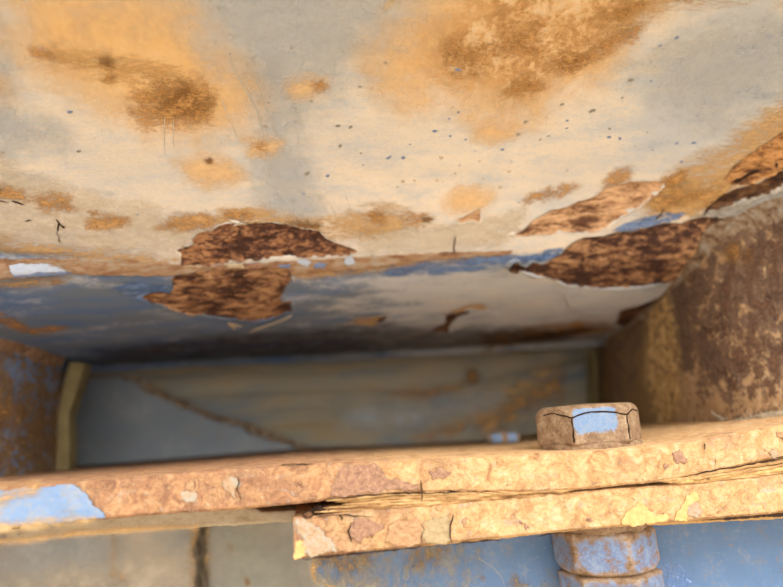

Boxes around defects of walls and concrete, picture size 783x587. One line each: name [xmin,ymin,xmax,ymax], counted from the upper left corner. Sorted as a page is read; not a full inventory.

corrosion [30,0,247,129]
corrosion [380,0,677,113]
peeling [135,219,360,333]
peeling [505,171,783,328]
corrosion [644,295,682,423]
corrosion [702,223,783,413]
corrosion [0,522,45,531]
corrosion [180,478,200,503]
corrosion [222,477,241,501]
corrosion [293,463,574,587]
corrosion [621,449,783,527]